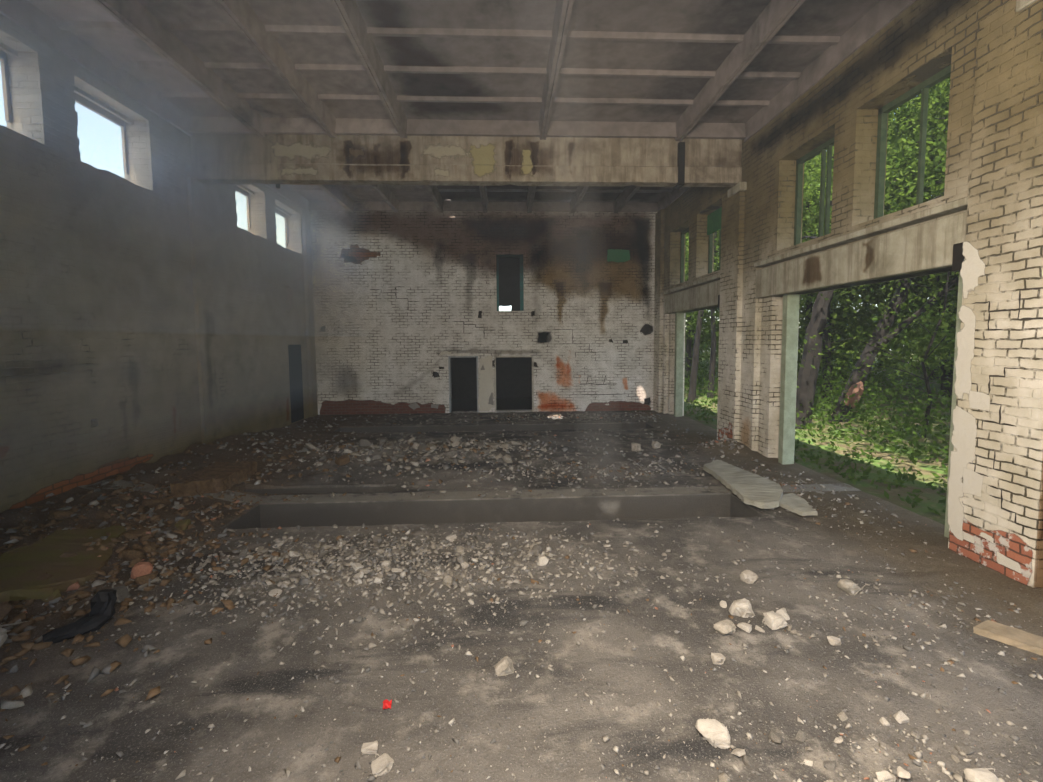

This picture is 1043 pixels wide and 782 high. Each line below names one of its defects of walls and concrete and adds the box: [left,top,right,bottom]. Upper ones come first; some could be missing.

damp [345,141,411,178]
damp [505,141,551,174]
spalling [340,244,380,265]
damp [537,232,646,323]
flaking render [320,399,446,415]
flaking render [585,397,652,411]
flaking render [948,241,1033,586]